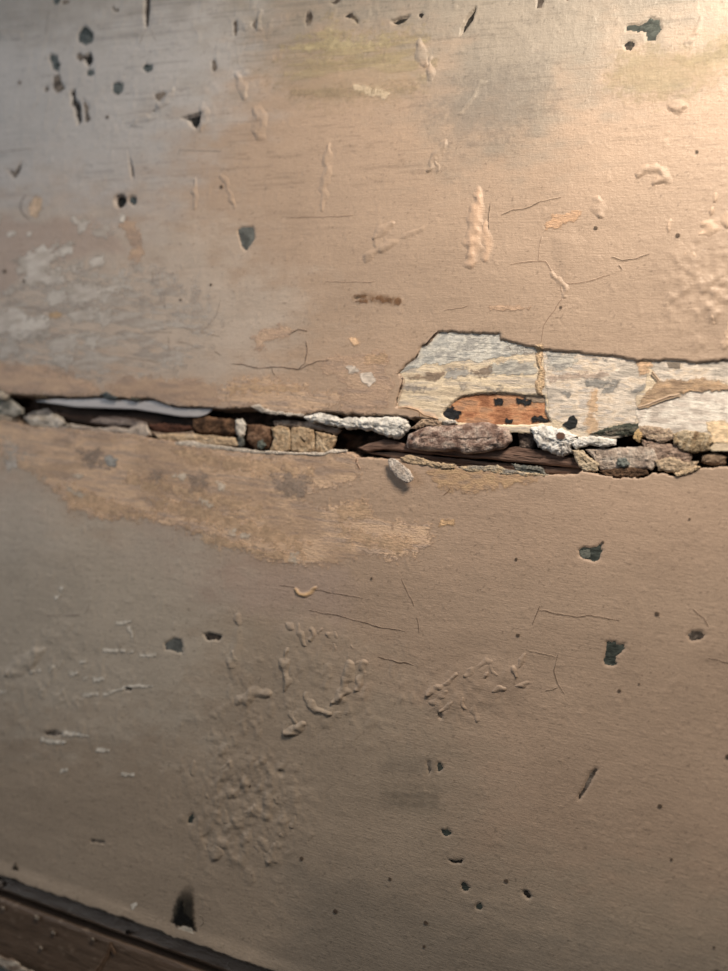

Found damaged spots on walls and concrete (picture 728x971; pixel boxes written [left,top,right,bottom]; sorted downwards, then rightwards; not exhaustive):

peeling [77,27,94,76]
peeling [45,54,91,125]
peeling [113,82,124,95]
peeling [12,215,106,288]
peeling [117,196,145,263]
peeling [238,227,255,251]
peeling [0,305,728,451]
crack [0,390,728,496]
peeling [0,418,454,570]